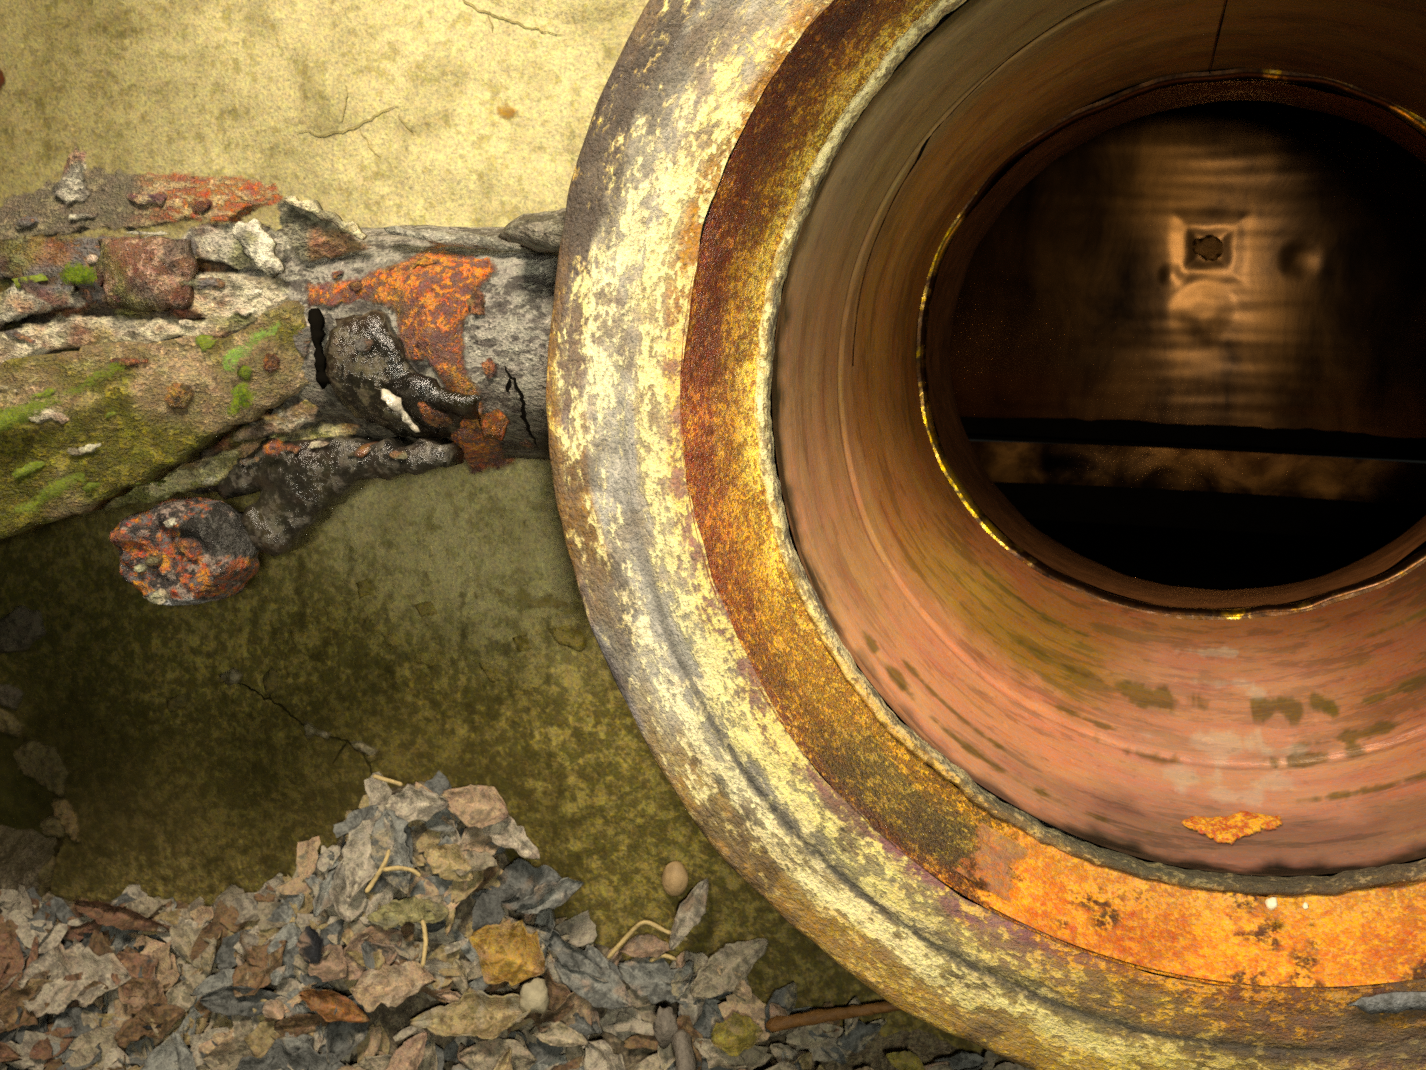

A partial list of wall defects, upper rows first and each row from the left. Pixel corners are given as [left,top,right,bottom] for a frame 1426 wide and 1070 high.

crack [463,0,563,35]
rust [478,409,510,441]
peeling [547,625,588,652]
crack [166,666,380,776]
rust [1182,810,1282,844]
rust [953,822,1426,987]